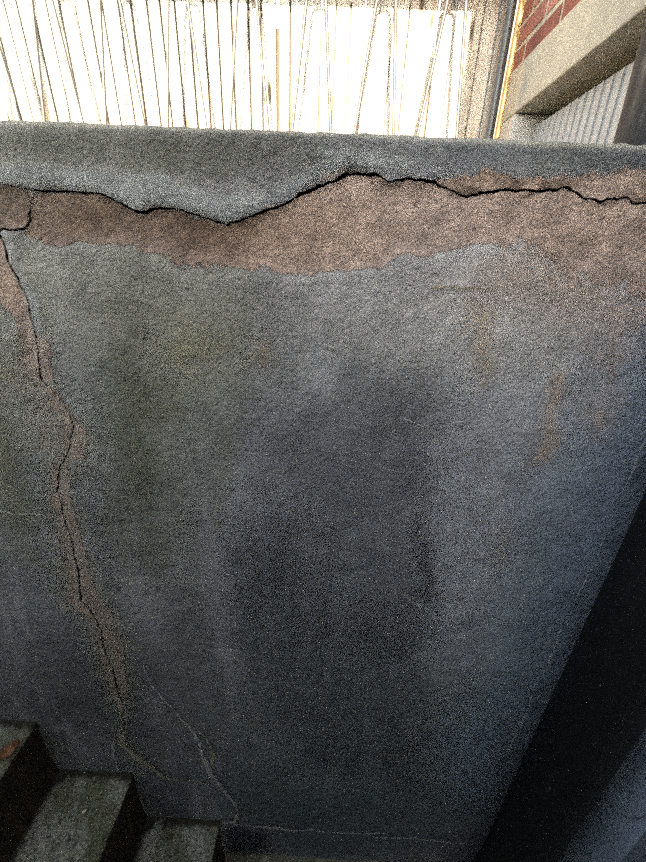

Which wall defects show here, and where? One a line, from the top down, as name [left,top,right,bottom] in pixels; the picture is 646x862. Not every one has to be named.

spalling [0,167,646,719]
crack [0,172,646,845]